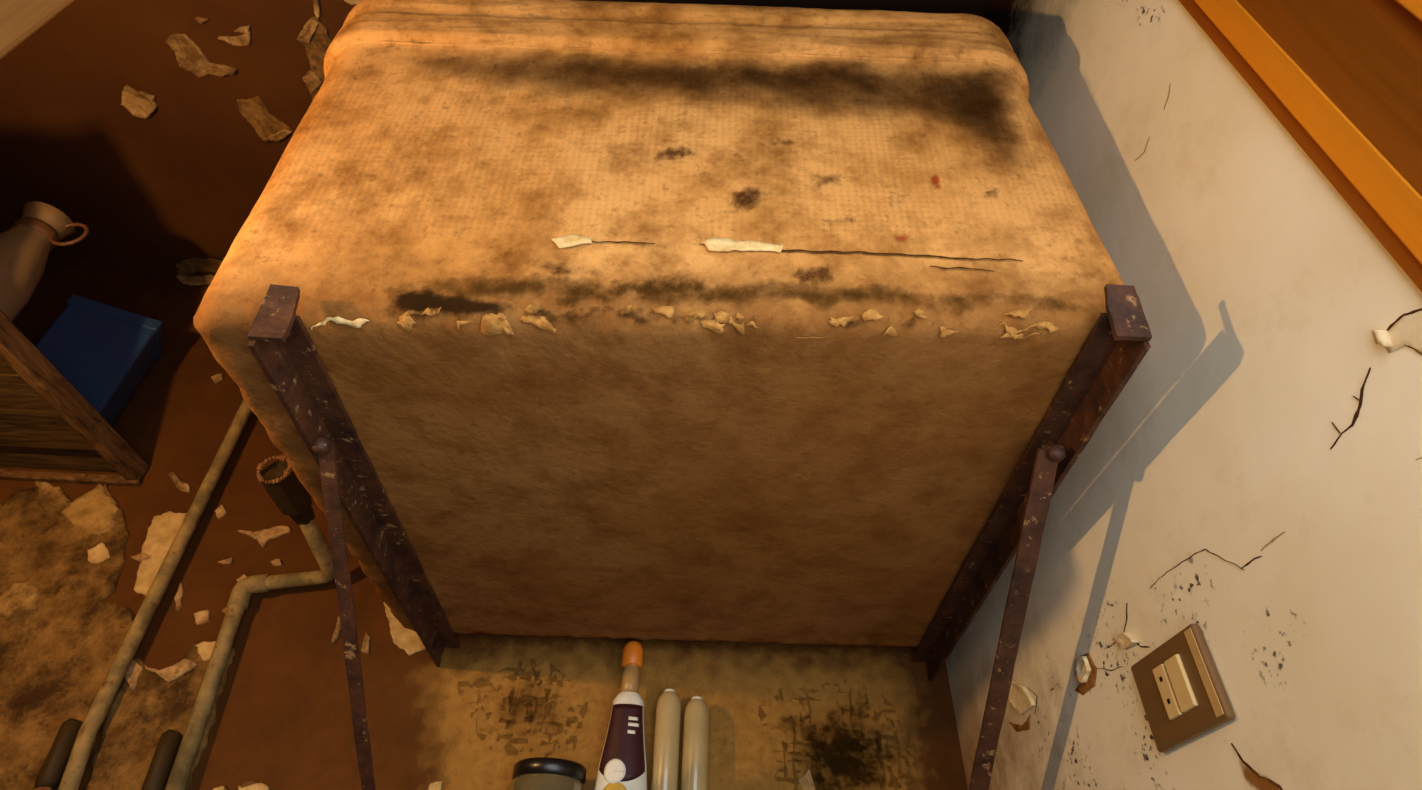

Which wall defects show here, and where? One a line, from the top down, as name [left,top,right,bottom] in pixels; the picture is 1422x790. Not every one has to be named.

peeling [165,34,237,78]
peeling [217,25,251,46]
peeling [296,0,331,101]
peeling [121,85,158,119]
peeling [237,96,293,143]
peeling [1371,308,1422,355]
crack [1330,367,1371,449]
peeling [237,526,291,566]
crack [1108,532,1285,649]
flaking render [0,480,236,790]
peeling [383,602,426,656]
flaking render [213,780,277,790]